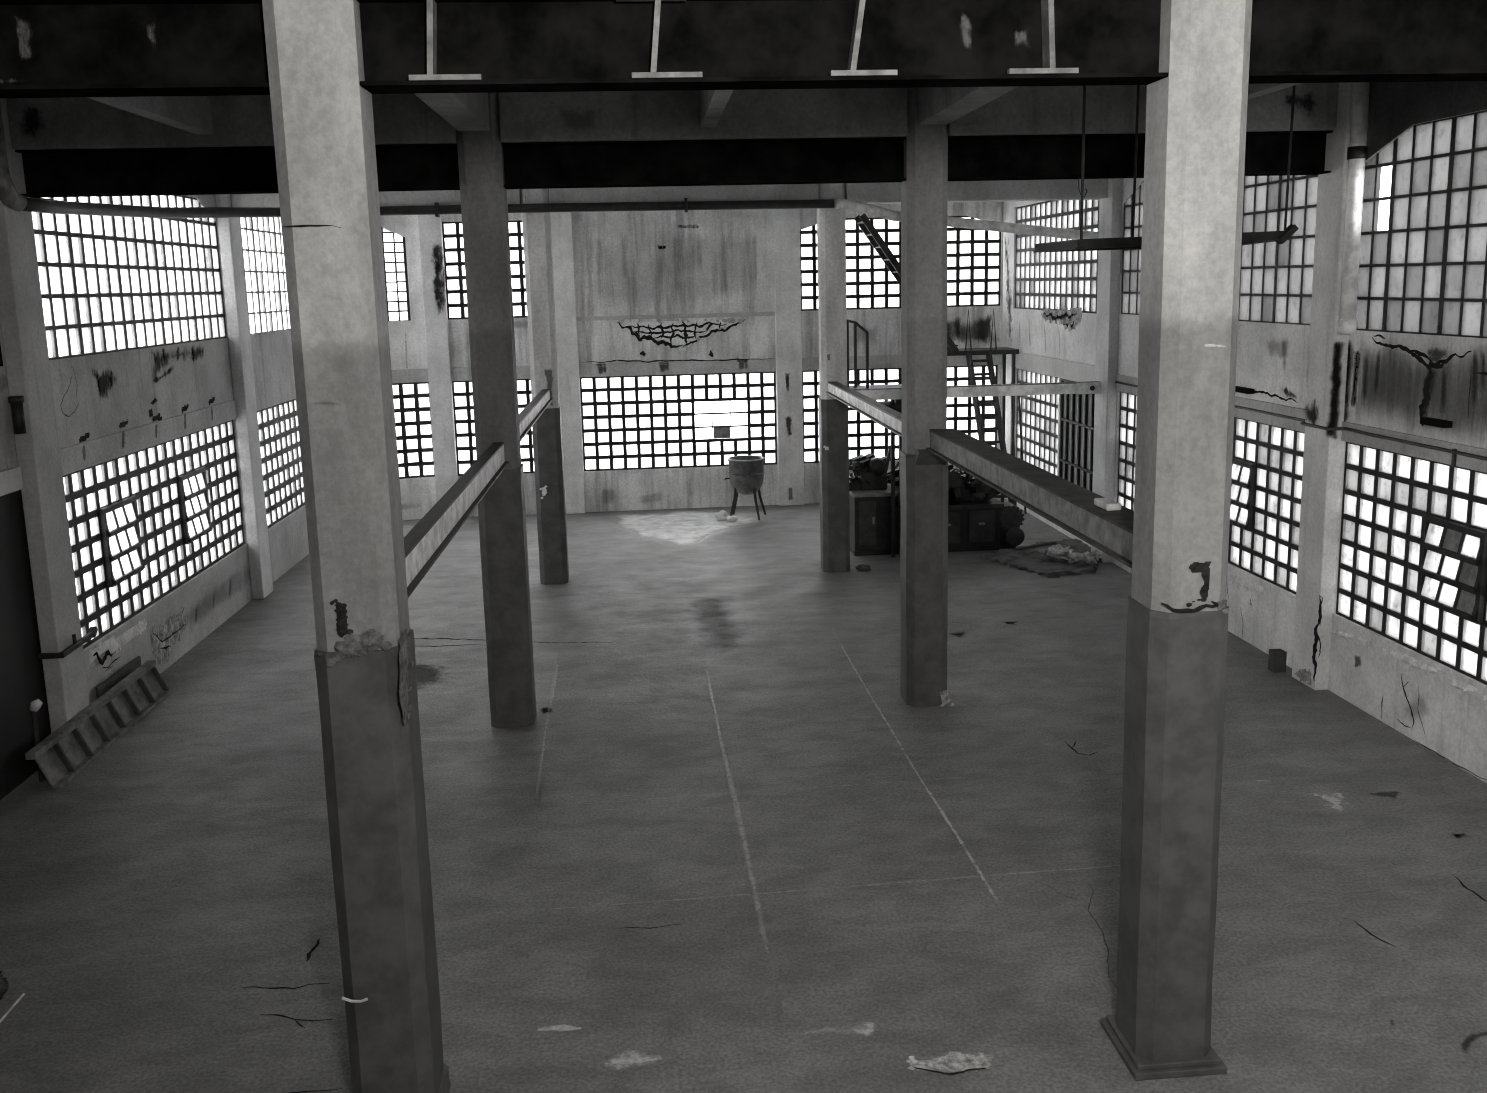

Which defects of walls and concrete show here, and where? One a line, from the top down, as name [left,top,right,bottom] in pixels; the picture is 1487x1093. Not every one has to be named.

peeling [617,317,745,357]
crack [1372,334,1487,426]
crack [1161,585,1252,638]
crack [1312,595,1323,681]
crack [1452,874,1487,902]